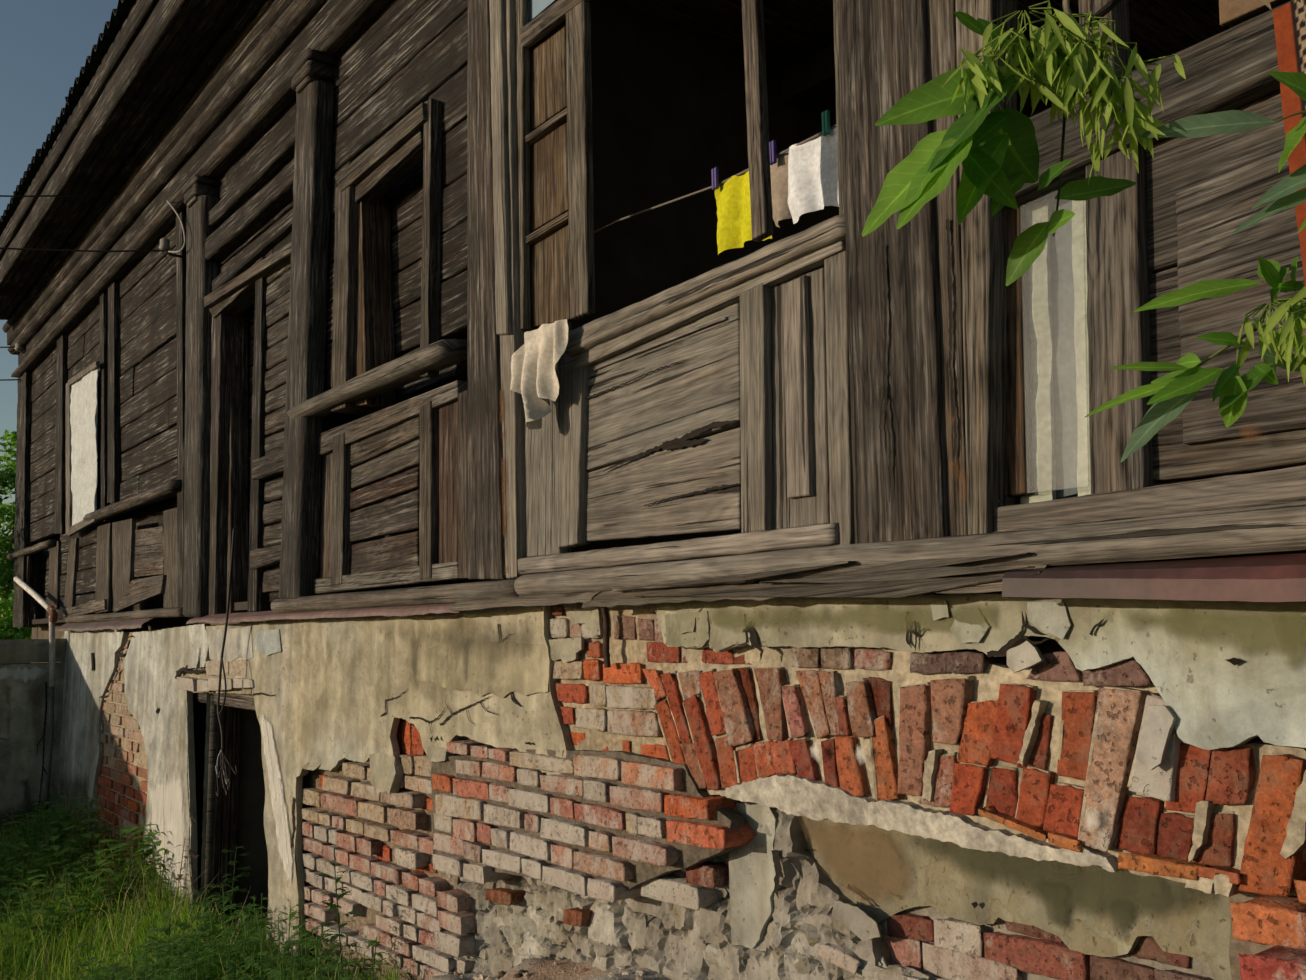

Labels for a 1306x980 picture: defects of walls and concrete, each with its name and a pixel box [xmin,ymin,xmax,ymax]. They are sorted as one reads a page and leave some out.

spalling [95,632,148,869]
crack [380,688,522,734]
spalling [300,600,1306,980]